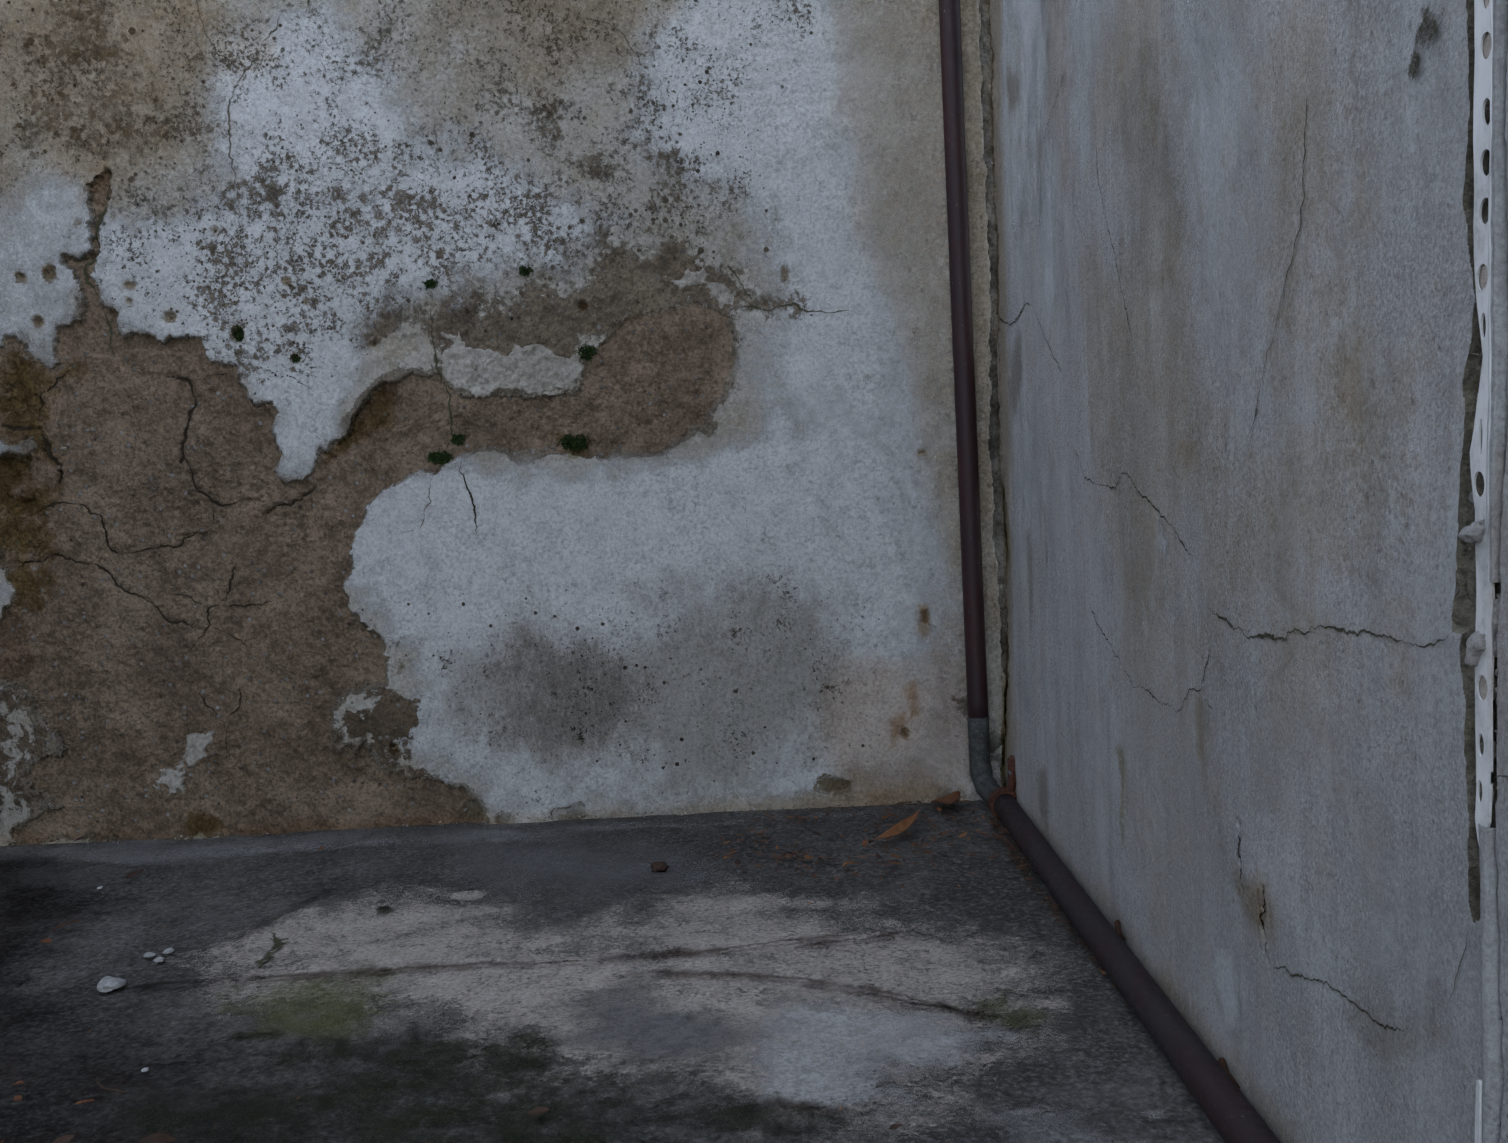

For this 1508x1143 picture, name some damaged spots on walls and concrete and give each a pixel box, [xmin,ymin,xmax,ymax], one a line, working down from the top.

crack [196,0,310,258]
crack [728,266,852,313]
crack [1250,42,1311,441]
crack [2,373,315,647]
peeling [0,0,880,846]
damp [0,0,976,864]
crack [1075,451,1191,555]
crack [1090,607,1448,712]
crack [1273,966,1405,1031]
crack [1450,927,1470,998]